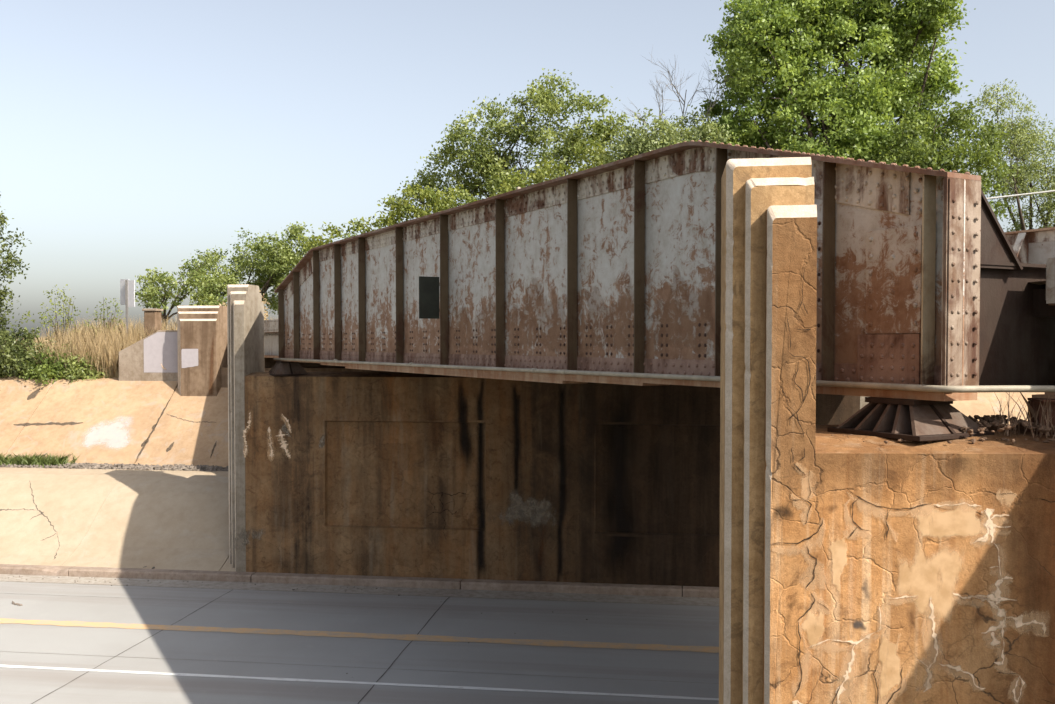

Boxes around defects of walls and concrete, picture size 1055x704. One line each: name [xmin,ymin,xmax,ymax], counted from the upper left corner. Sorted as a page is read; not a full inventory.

damp [267,414,291,459]
crack [0,480,60,559]
damp [458,382,485,572]
damp [558,388,566,579]
crack [774,269,826,696]
crack [849,490,932,539]
crack [873,662,903,704]